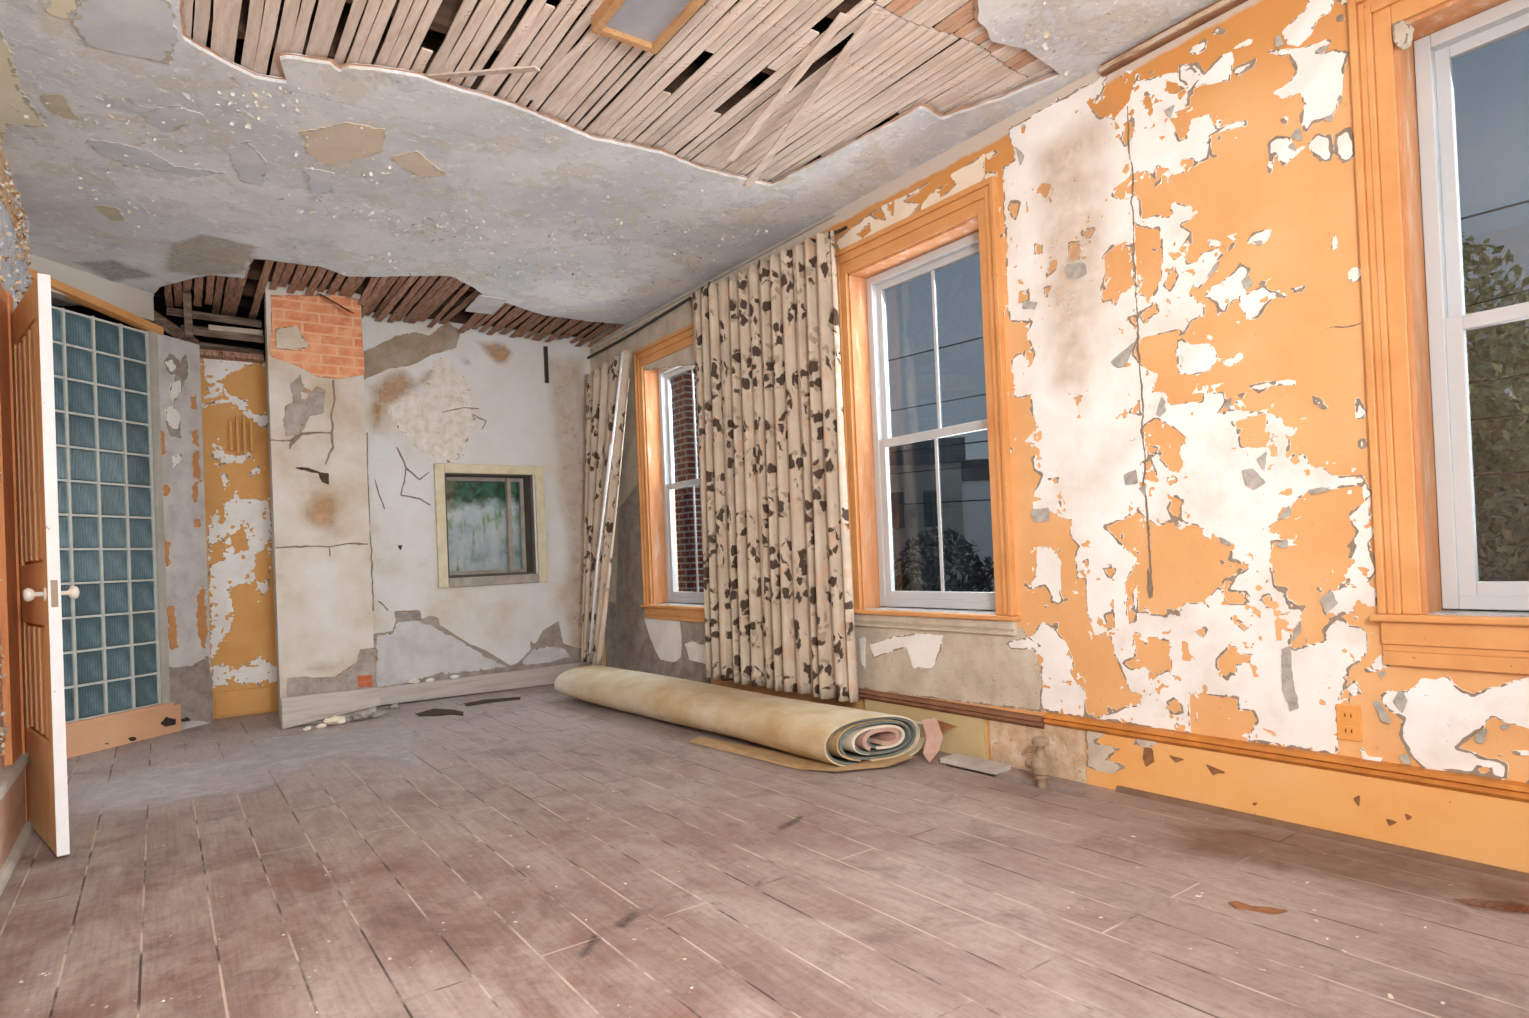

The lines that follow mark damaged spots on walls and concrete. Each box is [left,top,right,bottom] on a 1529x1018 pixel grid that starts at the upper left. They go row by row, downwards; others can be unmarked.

crack [271,380,430,611]
crack [442,407,487,429]
peeling [0,0,1529,780]